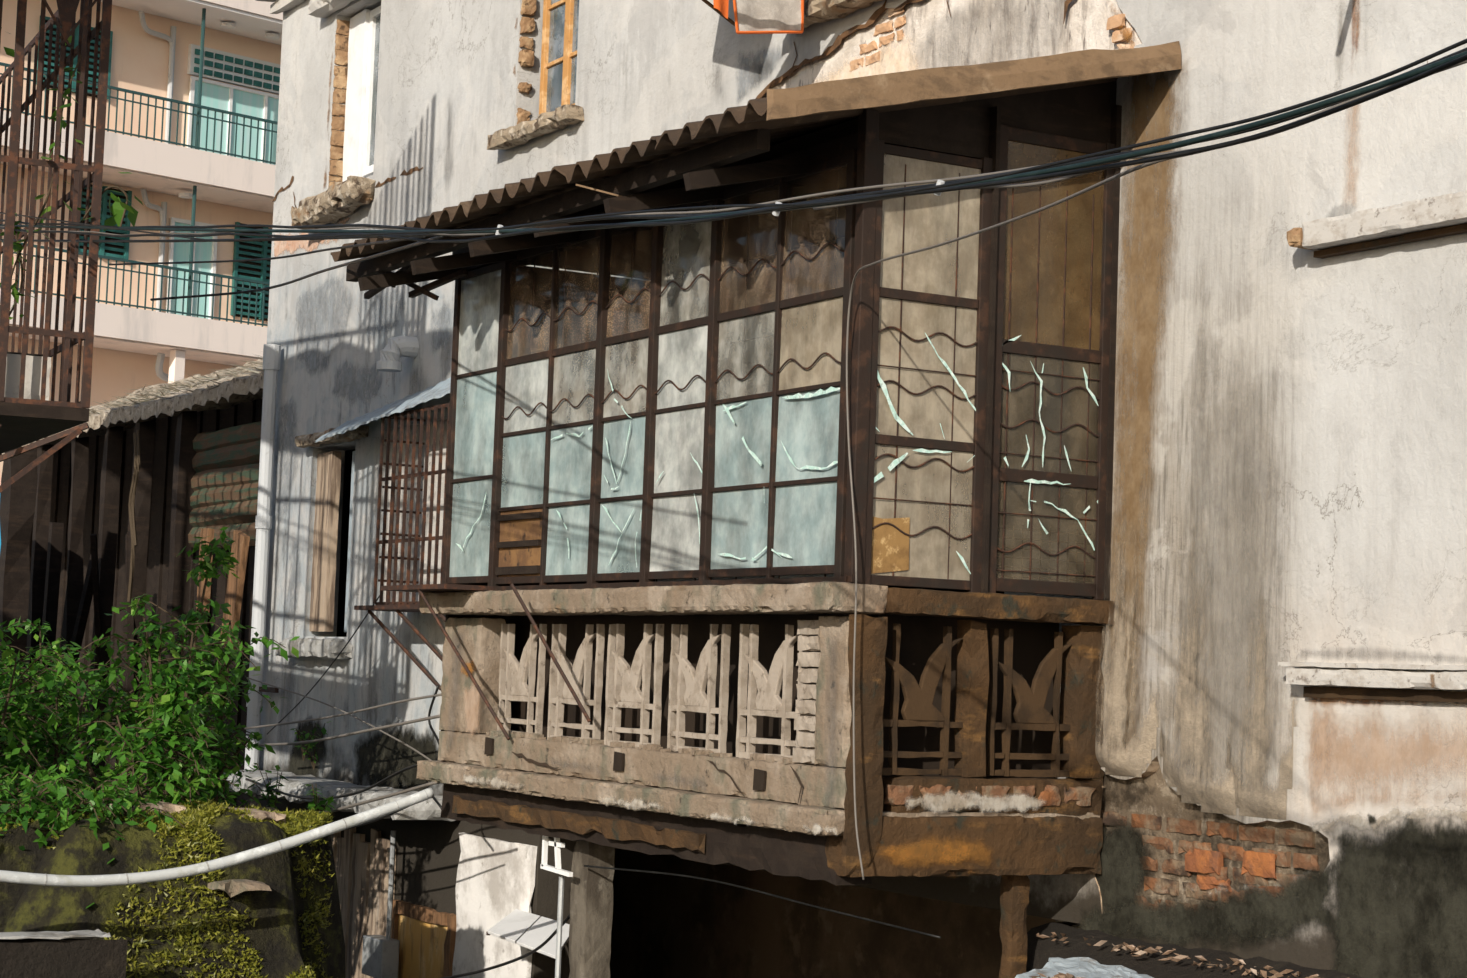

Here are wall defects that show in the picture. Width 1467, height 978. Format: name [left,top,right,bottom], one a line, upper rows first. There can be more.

flaking render [328,20,350,188]
flaking render [738,0,1142,98]
water stain [1312,698,1467,784]
flaking render [884,756,1333,950]
water stain [1311,800,1467,978]